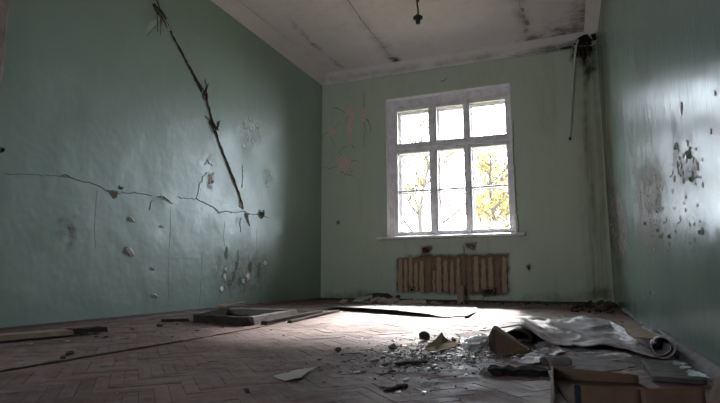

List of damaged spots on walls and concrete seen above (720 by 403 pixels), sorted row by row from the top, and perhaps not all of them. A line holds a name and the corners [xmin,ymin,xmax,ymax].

crack [347,0,398,62]
crack [6,0,268,302]
peeling [635,140,704,252]
peeling [219,247,268,293]